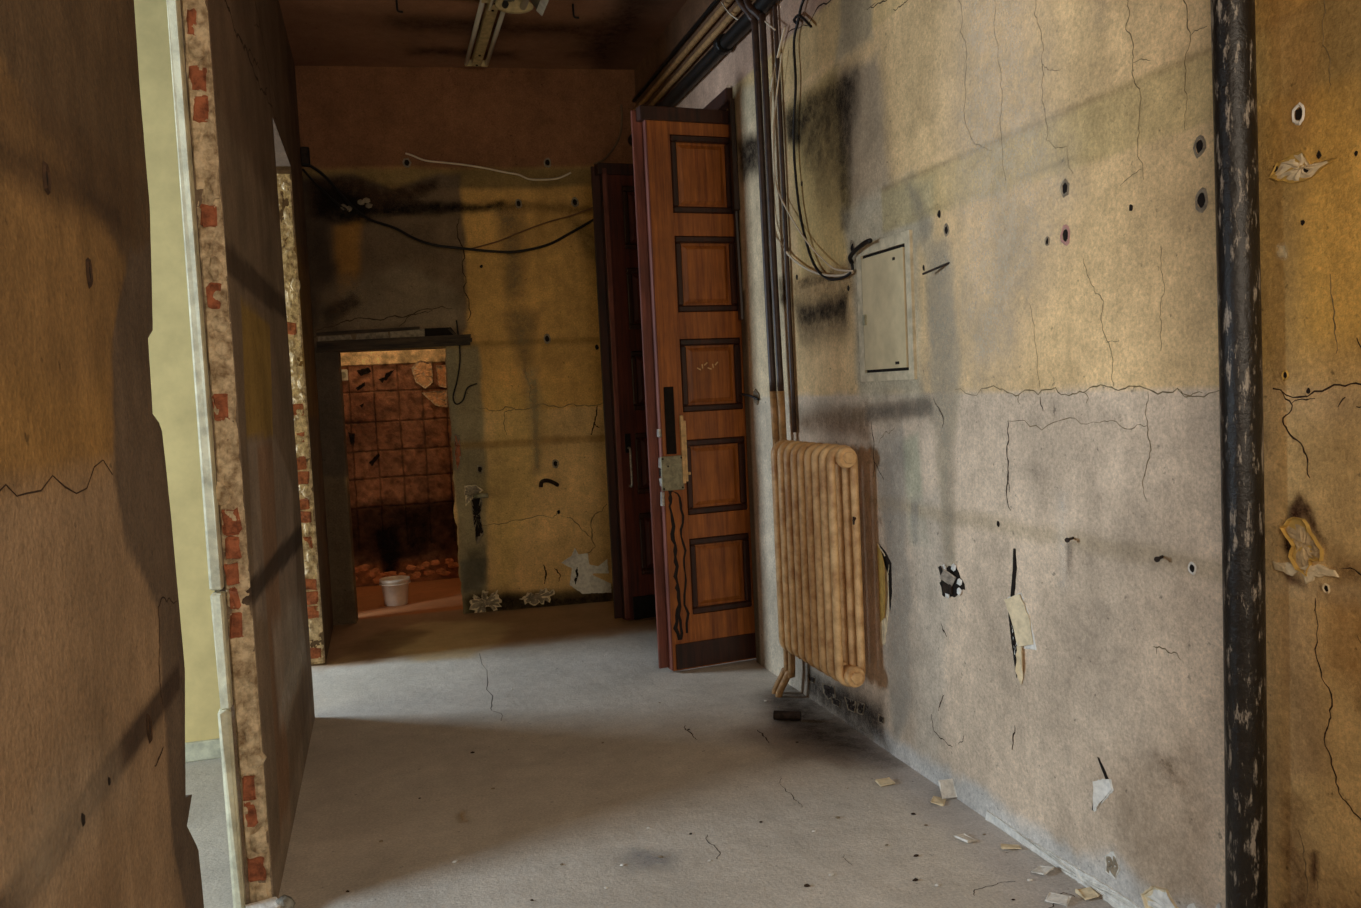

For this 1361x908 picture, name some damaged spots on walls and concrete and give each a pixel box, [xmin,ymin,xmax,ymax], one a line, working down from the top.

crack [1120,3,1150,186]
crack [1183,0,1207,128]
flaking render [356,367,395,408]
flaking render [411,360,448,407]
crack [933,259,1219,511]
crack [1273,274,1361,478]
crack [0,460,113,497]
peeling [561,548,612,594]
spalling [938,563,965,598]
flaking render [1272,517,1339,594]
crack [1314,598,1361,820]
flaking render [985,810,1198,908]